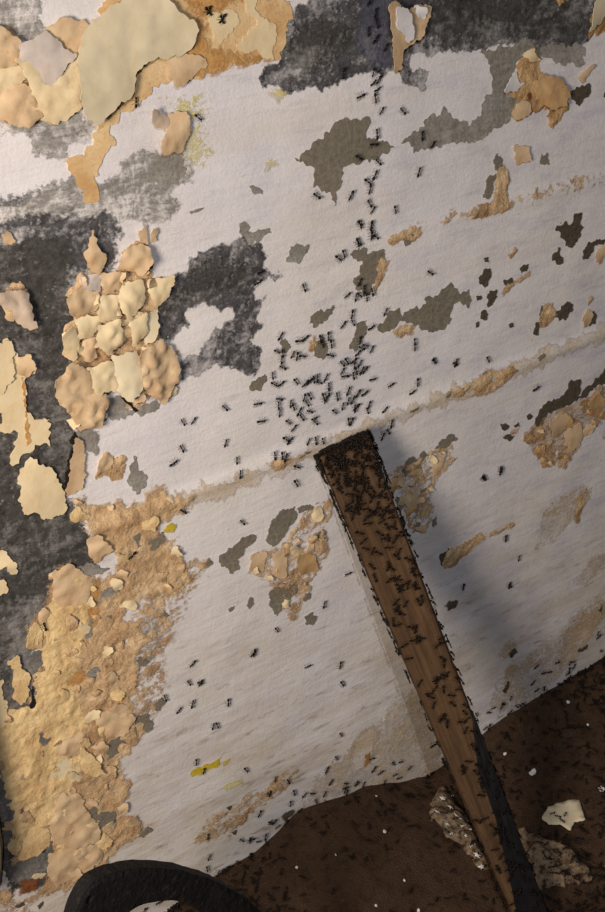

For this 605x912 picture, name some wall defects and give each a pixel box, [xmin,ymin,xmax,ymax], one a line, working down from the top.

water stain [283,0,395,72]
peeling [388,1,432,73]
water stain [423,0,589,49]
peeling [0,0,293,204]
peeling [295,37,595,205]
peeling [472,144,549,219]
water stain [0,184,124,292]
water stain [158,257,251,326]
peeling [533,301,573,336]
peeling [500,368,605,469]
peeling [388,434,457,533]
peeling [0,225,335,897]